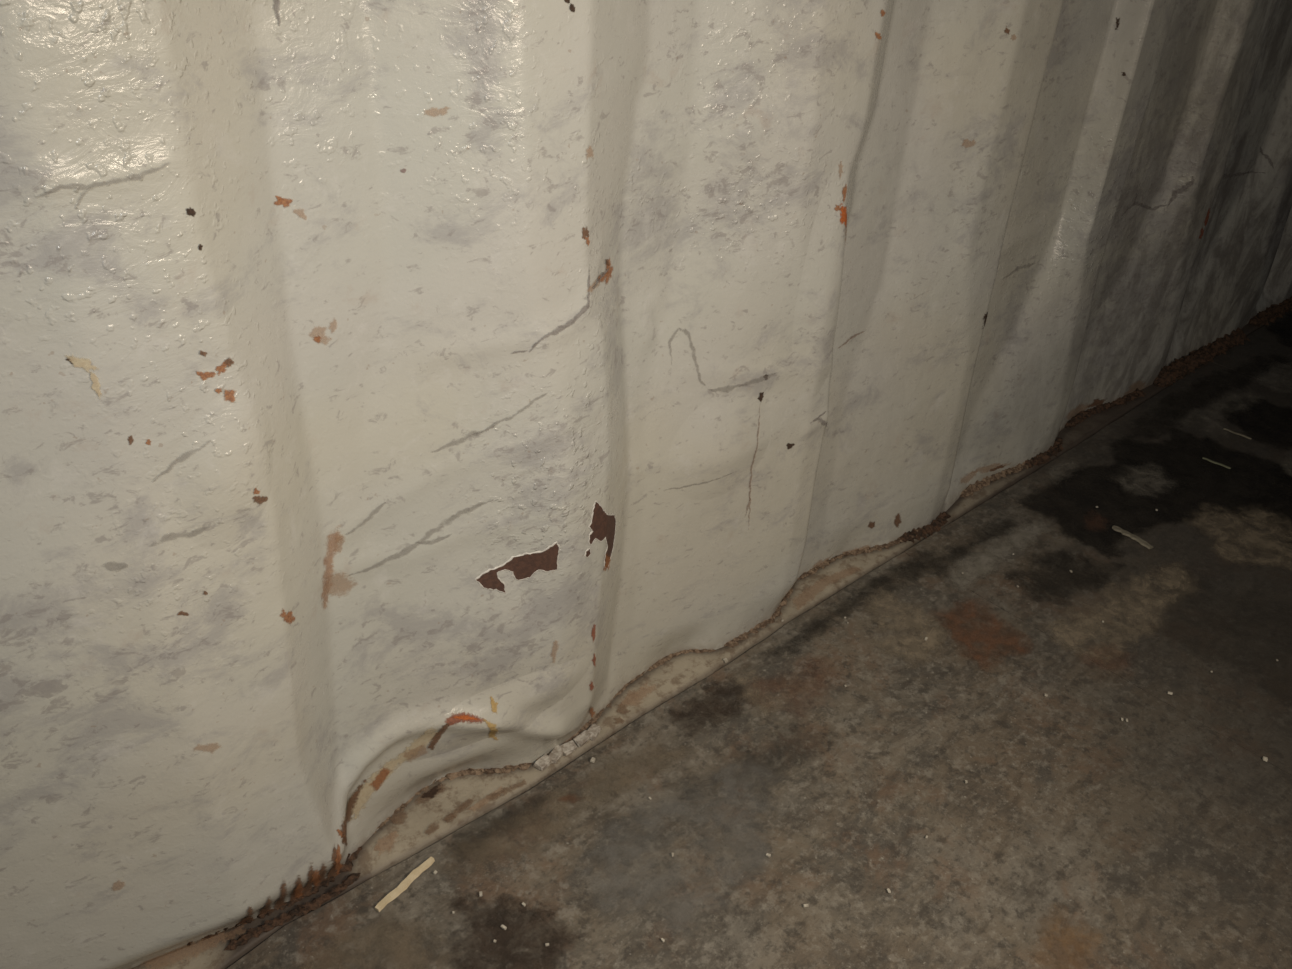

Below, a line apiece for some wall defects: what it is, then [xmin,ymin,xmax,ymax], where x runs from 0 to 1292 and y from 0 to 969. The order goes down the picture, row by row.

rust [835,186,847,228]
rust [959,296,1292,498]
peeling [475,541,560,594]
peeling [584,500,616,571]
damp [1013,552,1109,598]
rust [374,511,951,835]
rust [180,697,498,950]